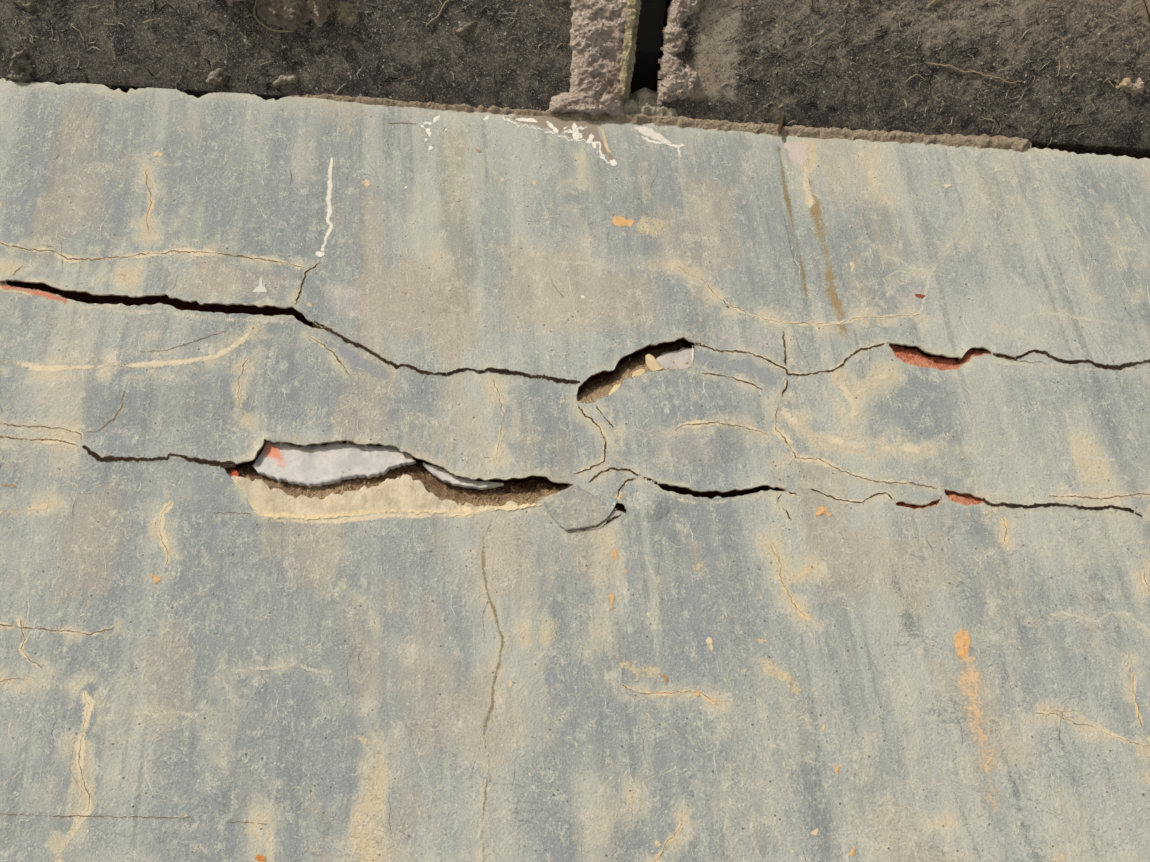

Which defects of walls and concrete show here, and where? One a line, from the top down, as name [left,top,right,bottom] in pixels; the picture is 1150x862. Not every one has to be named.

crack [0,239,937,521]
flaking render [577,337,777,403]
flaking render [887,342,1016,371]
crack [991,349,1150,372]
flaking render [224,439,626,532]
flaking render [896,489,983,509]
crack [982,489,1150,517]
crack [480,523,505,862]